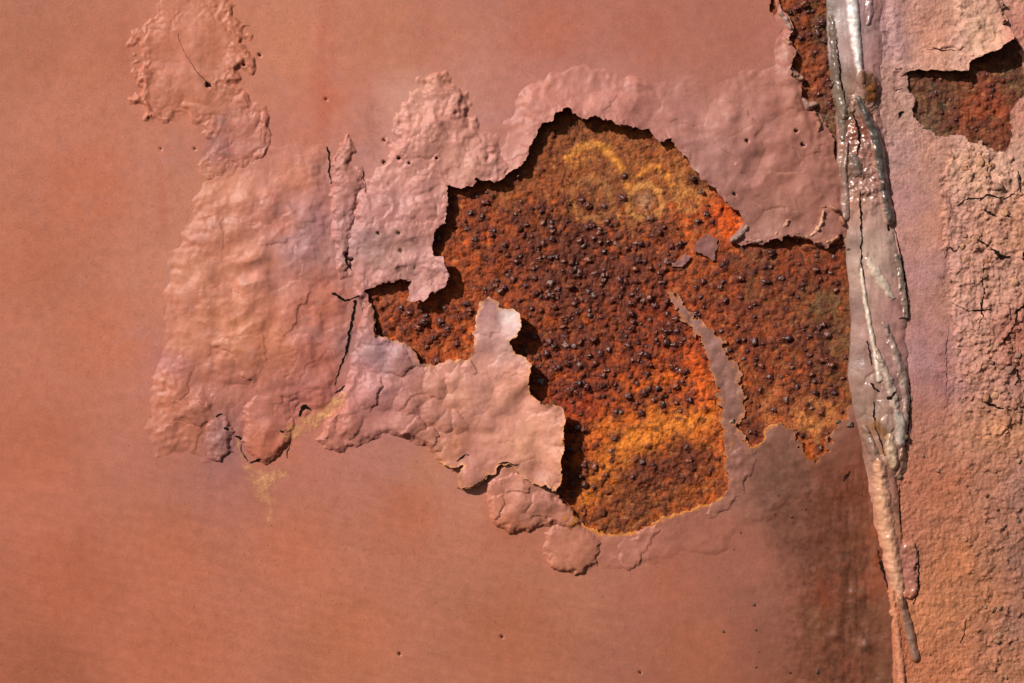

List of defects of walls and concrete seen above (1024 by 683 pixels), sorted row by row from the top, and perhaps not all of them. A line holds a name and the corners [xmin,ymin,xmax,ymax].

rust [769,0,837,160]
rust [906,39,1024,153]
crack [325,147,333,182]
crack [957,160,1022,218]
crack [280,404,311,457]
crack [332,292,377,393]
peeling [315,0,870,571]
rust [360,107,852,535]
crack [945,236,1024,396]
crack [986,369,1021,411]